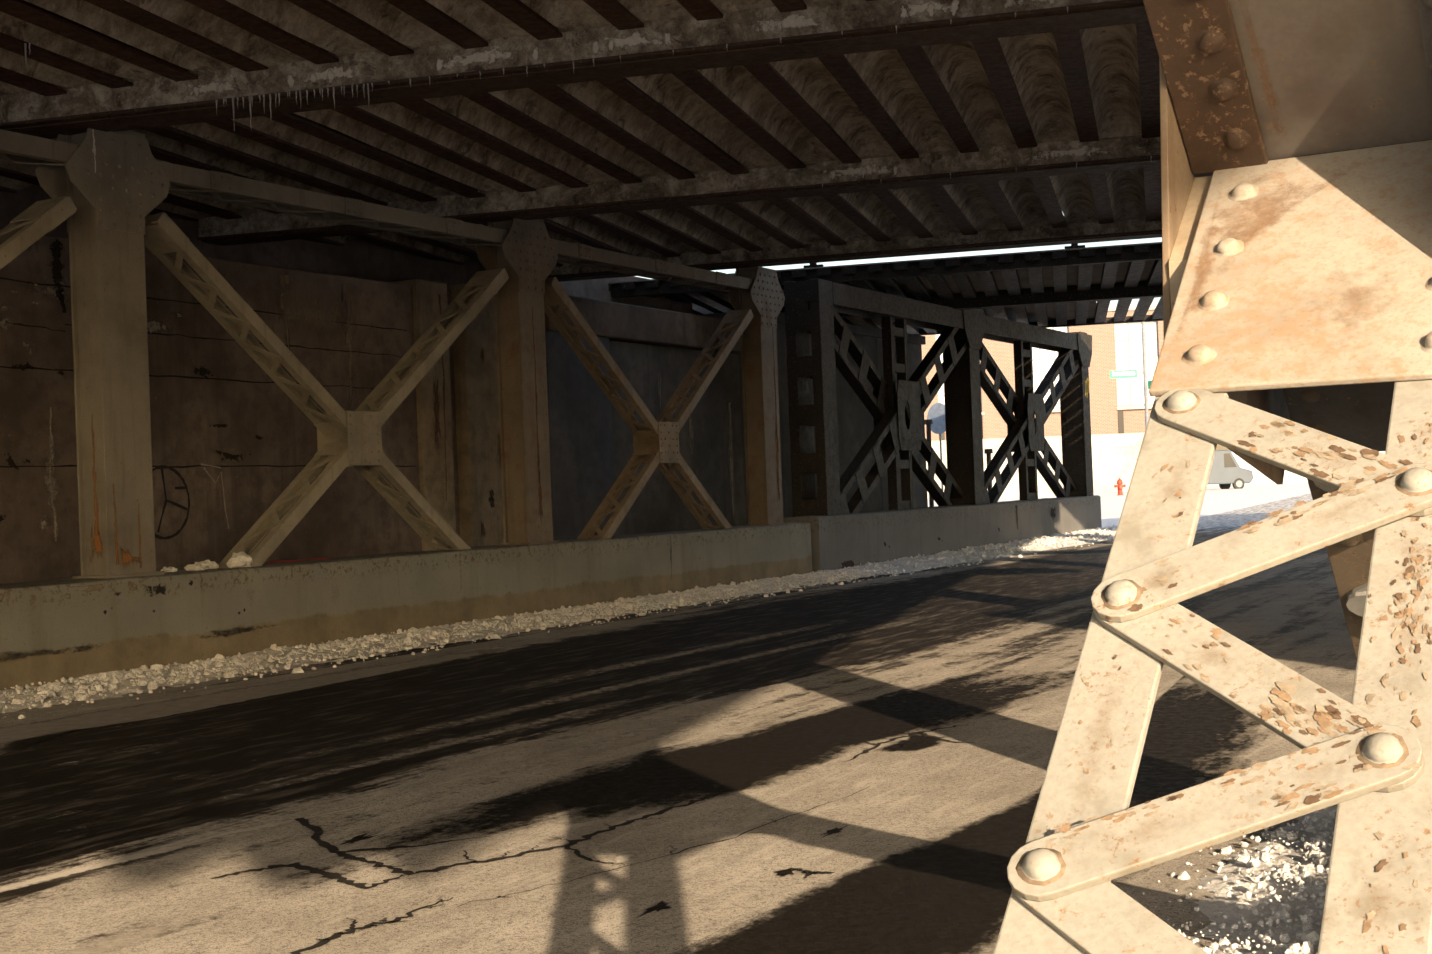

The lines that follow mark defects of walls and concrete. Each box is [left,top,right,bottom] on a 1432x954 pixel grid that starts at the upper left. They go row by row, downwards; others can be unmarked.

leakage [32,239,67,313]
corrosion [91,414,142,568]